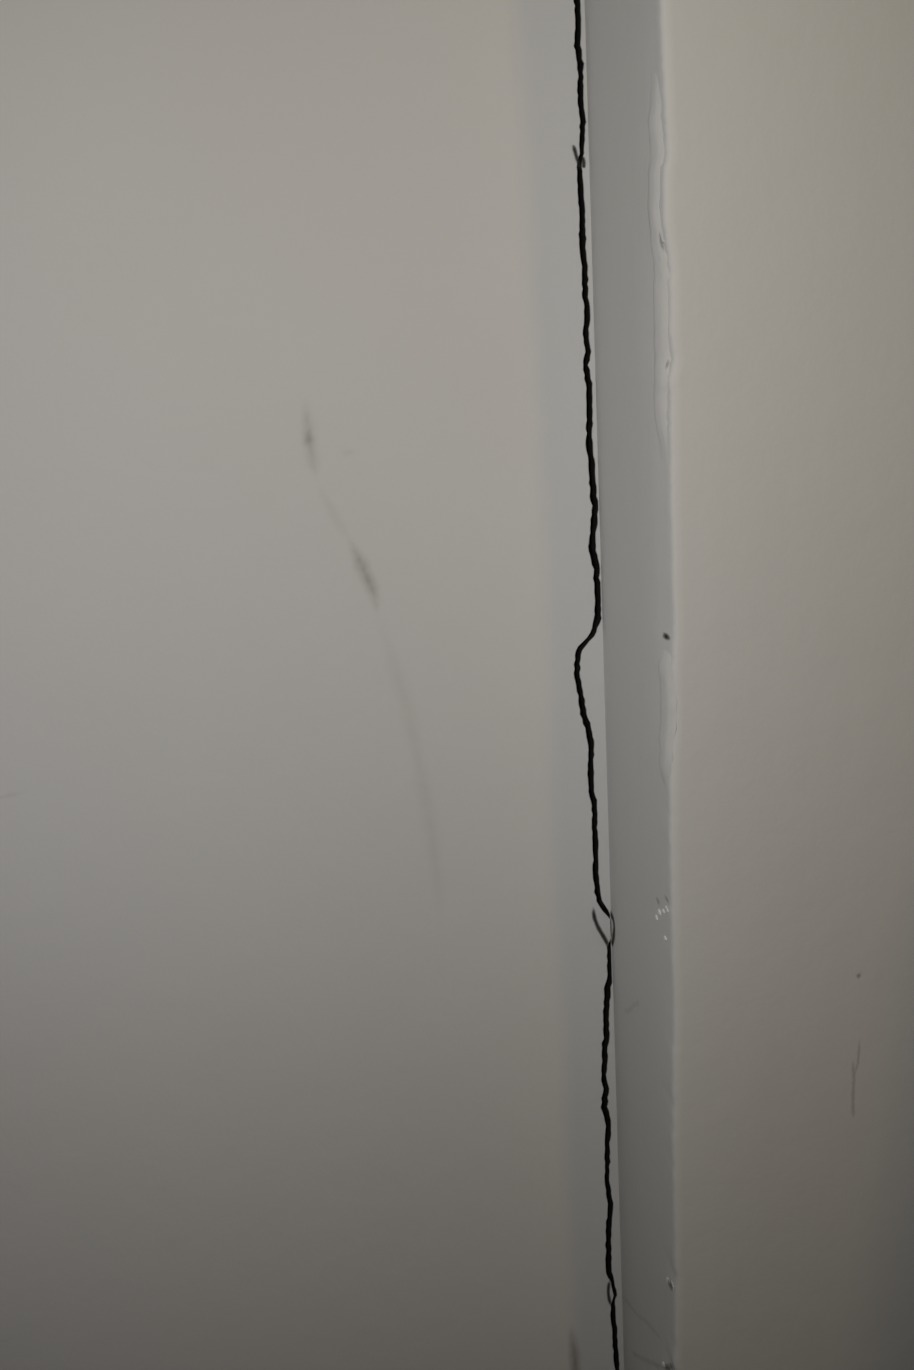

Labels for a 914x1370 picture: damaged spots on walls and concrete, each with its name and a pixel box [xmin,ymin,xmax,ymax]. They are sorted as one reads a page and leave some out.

crack [573,0,620,1370]